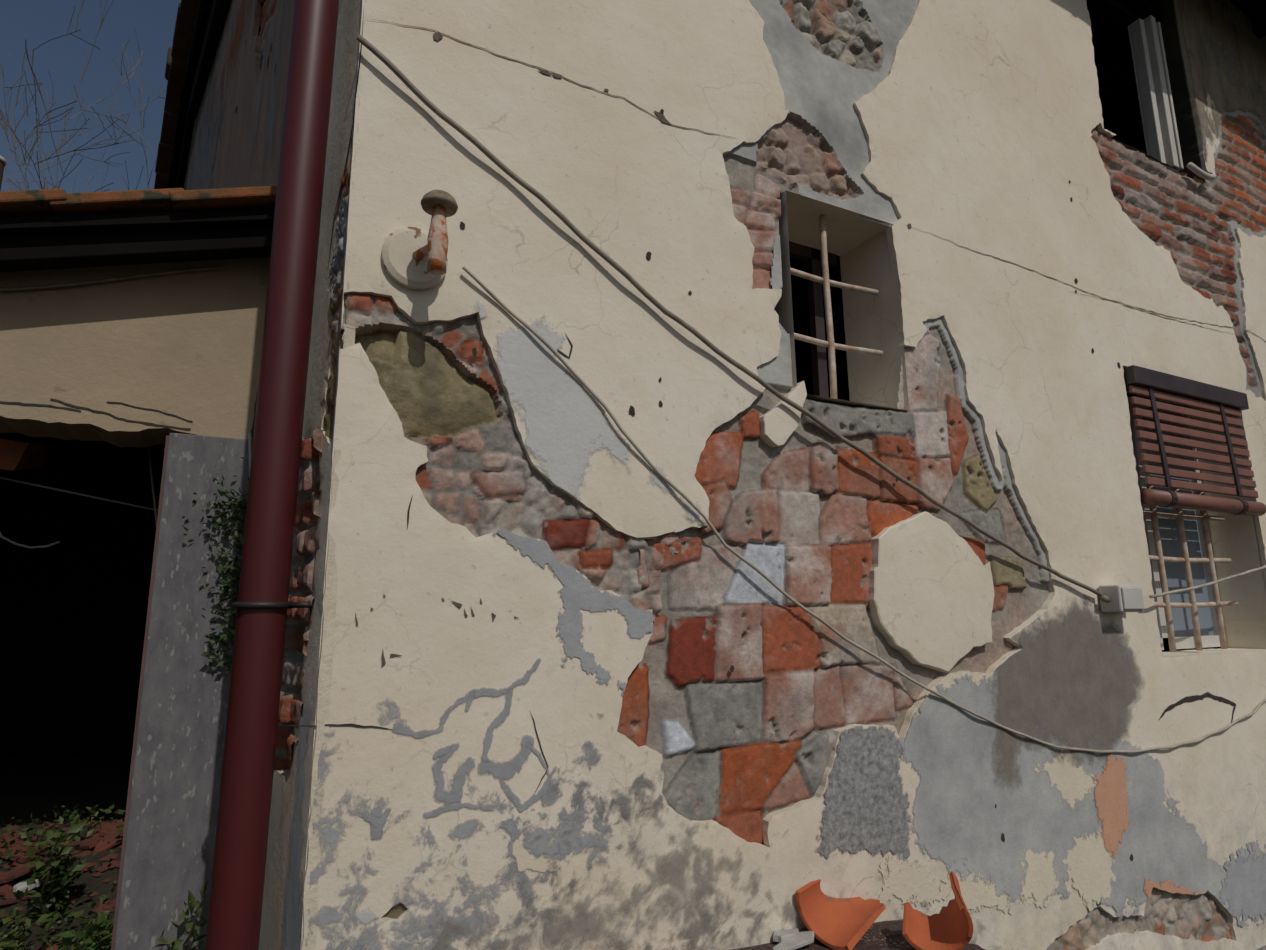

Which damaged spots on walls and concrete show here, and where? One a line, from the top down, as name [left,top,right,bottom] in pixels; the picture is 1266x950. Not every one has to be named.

crack [328,11,735,267]
flaking render [723,0,918,289]
water stain [1179,0,1266,161]
crack [905,224,1266,342]
flaking render [1091,109,1266,399]
crack [0,398,193,430]
flaking render [274,161,1266,950]
crack [1159,692,1236,723]
water stain [300,732,771,950]